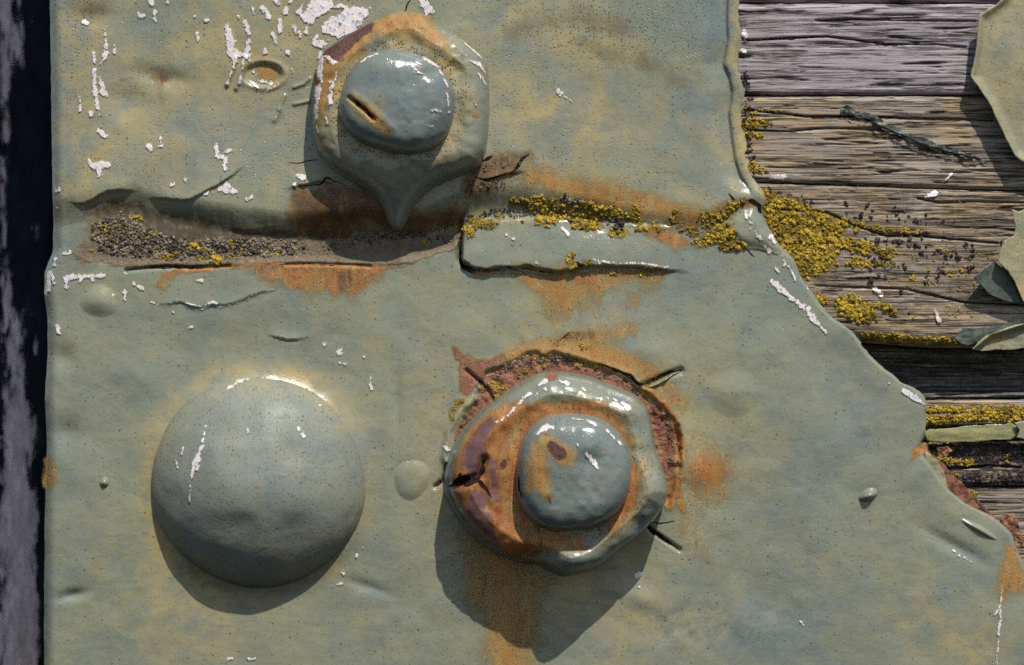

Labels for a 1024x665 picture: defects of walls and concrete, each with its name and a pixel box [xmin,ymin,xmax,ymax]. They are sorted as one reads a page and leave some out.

peeling [78,29,116,117]
peeling [224,0,371,133]
rust [313,11,449,122]
peeling [88,158,111,180]
peeling [204,143,253,202]
rust [157,261,406,296]
rust [286,180,460,239]
crack [458,220,584,274]
rust [461,152,751,248]
peeling [744,213,828,335]
crack [596,363,682,405]
rust [452,323,738,665]